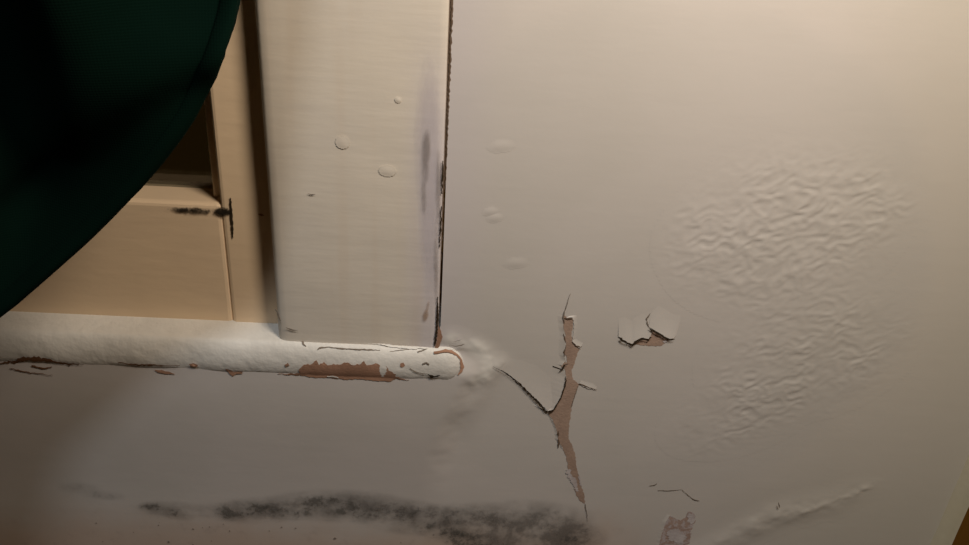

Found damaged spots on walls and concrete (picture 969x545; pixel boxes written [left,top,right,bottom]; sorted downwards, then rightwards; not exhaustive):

peeling [618,306,681,344]
peeling [280,360,405,382]
spalling [655,512,696,545]